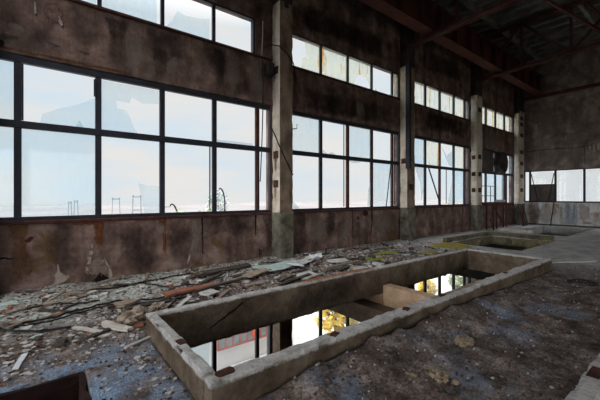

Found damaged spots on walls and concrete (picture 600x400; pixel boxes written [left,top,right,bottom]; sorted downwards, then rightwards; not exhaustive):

peeling [53,264,69,285]
spalling [85,244,113,282]
crack [210,302,243,329]